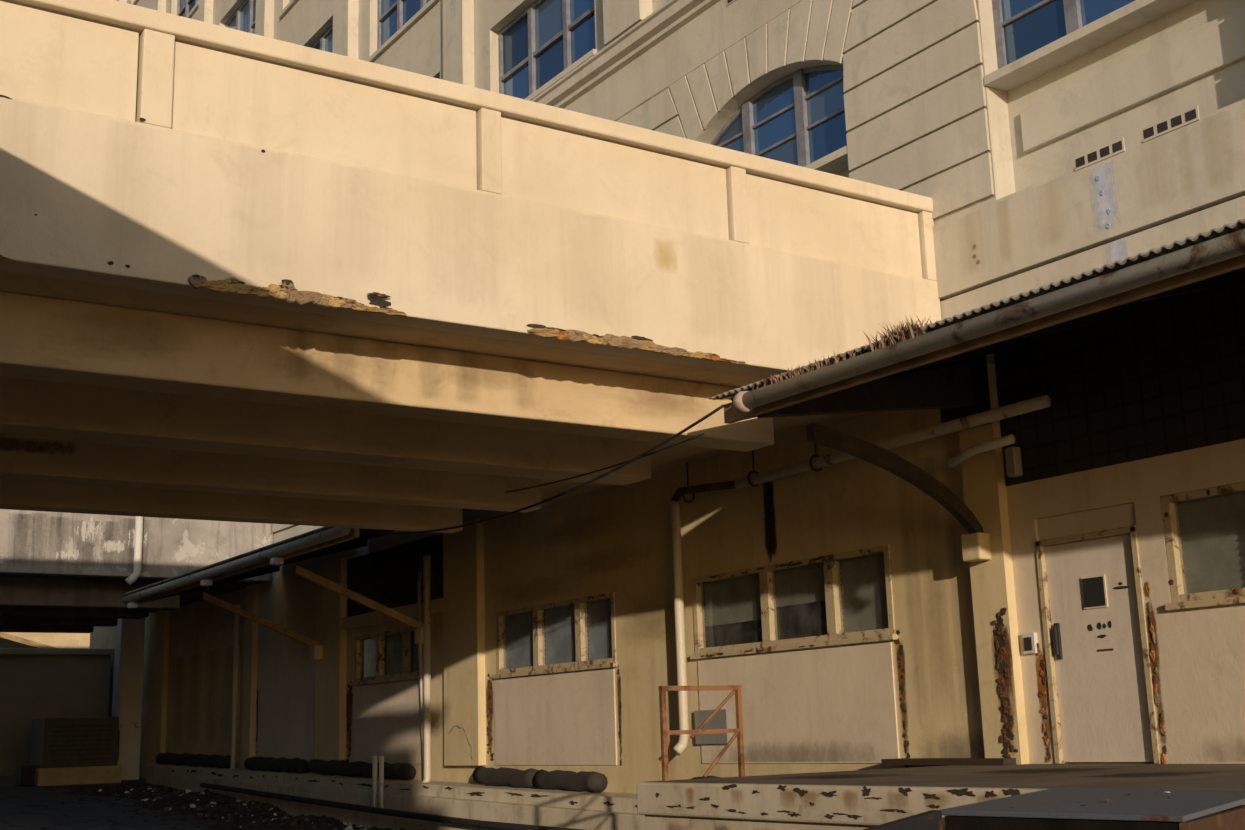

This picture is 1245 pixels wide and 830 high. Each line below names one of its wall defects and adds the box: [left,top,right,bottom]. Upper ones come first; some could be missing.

spalling [188,274,406,316]
spalling [527,324,748,365]
rust [1146,582,1167,764]
rust [895,630,910,768]
rust [1036,643,1051,762]
spalling [656,793,746,814]
spalling [761,785,837,817]
spalling [861,786,1020,813]